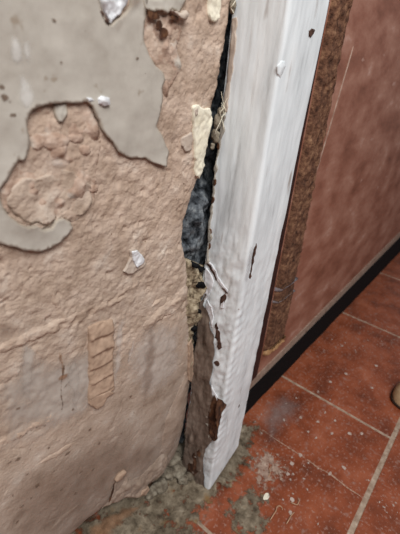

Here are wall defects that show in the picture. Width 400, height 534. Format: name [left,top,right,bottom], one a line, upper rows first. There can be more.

peeling [0,0,189,252]
peeling [180,17,238,488]